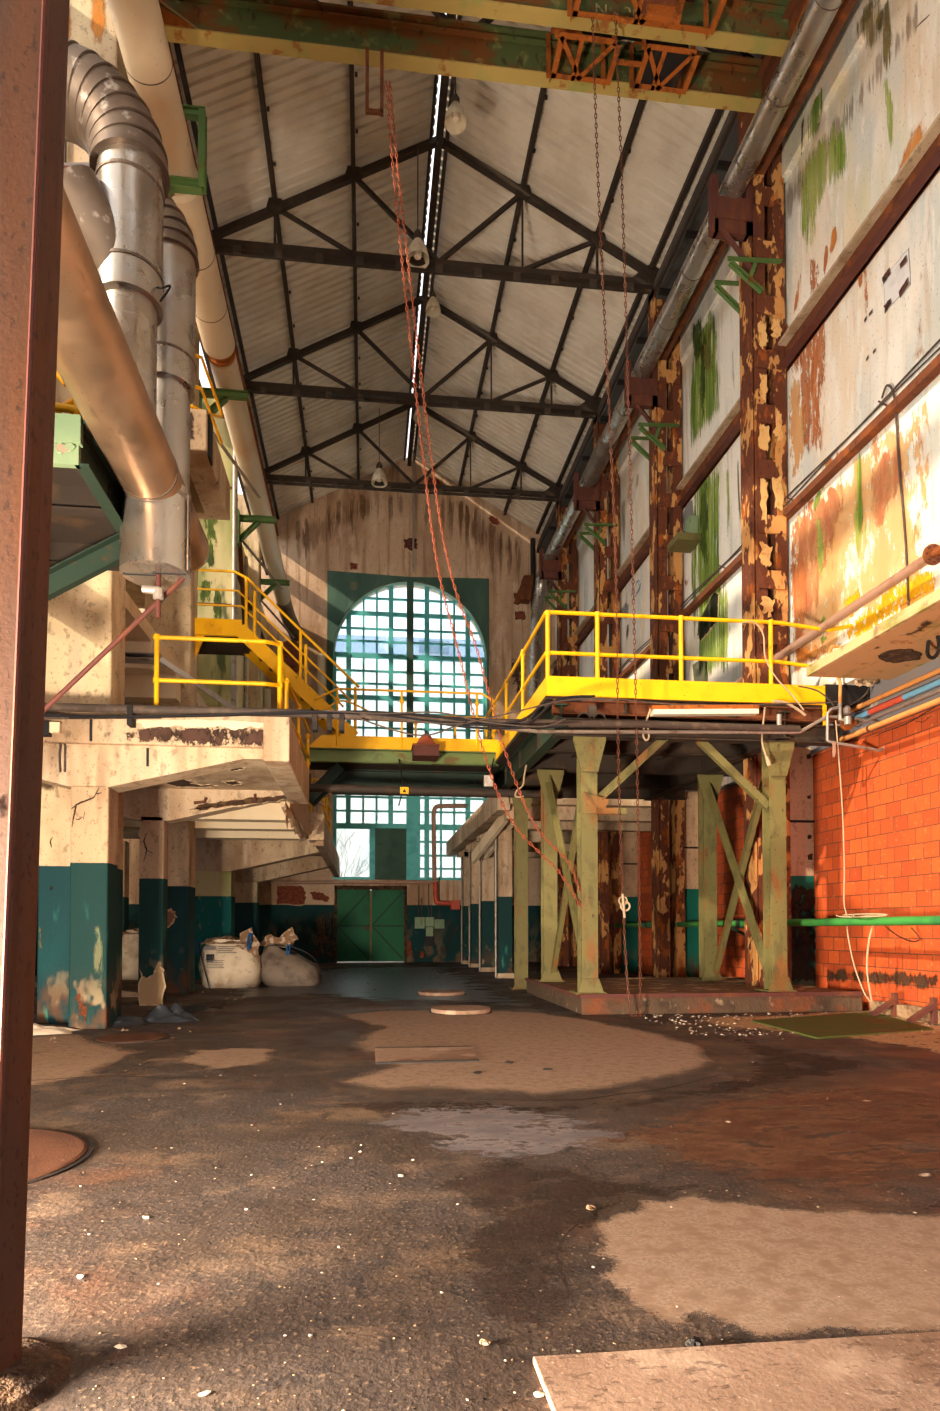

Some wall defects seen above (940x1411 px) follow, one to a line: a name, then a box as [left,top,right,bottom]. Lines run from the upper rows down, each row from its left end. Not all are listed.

leakage [857,0,881,49]
leakage [801,88,822,155]
leakage [834,131,845,176]
peeling [758,319,782,350]
leakage [690,311,717,441]
peeling [758,373,784,452]
rust [789,324,825,475]
rust [794,404,928,671]
peeling [94,928,102,988]
leakage [226,912,940,1336]